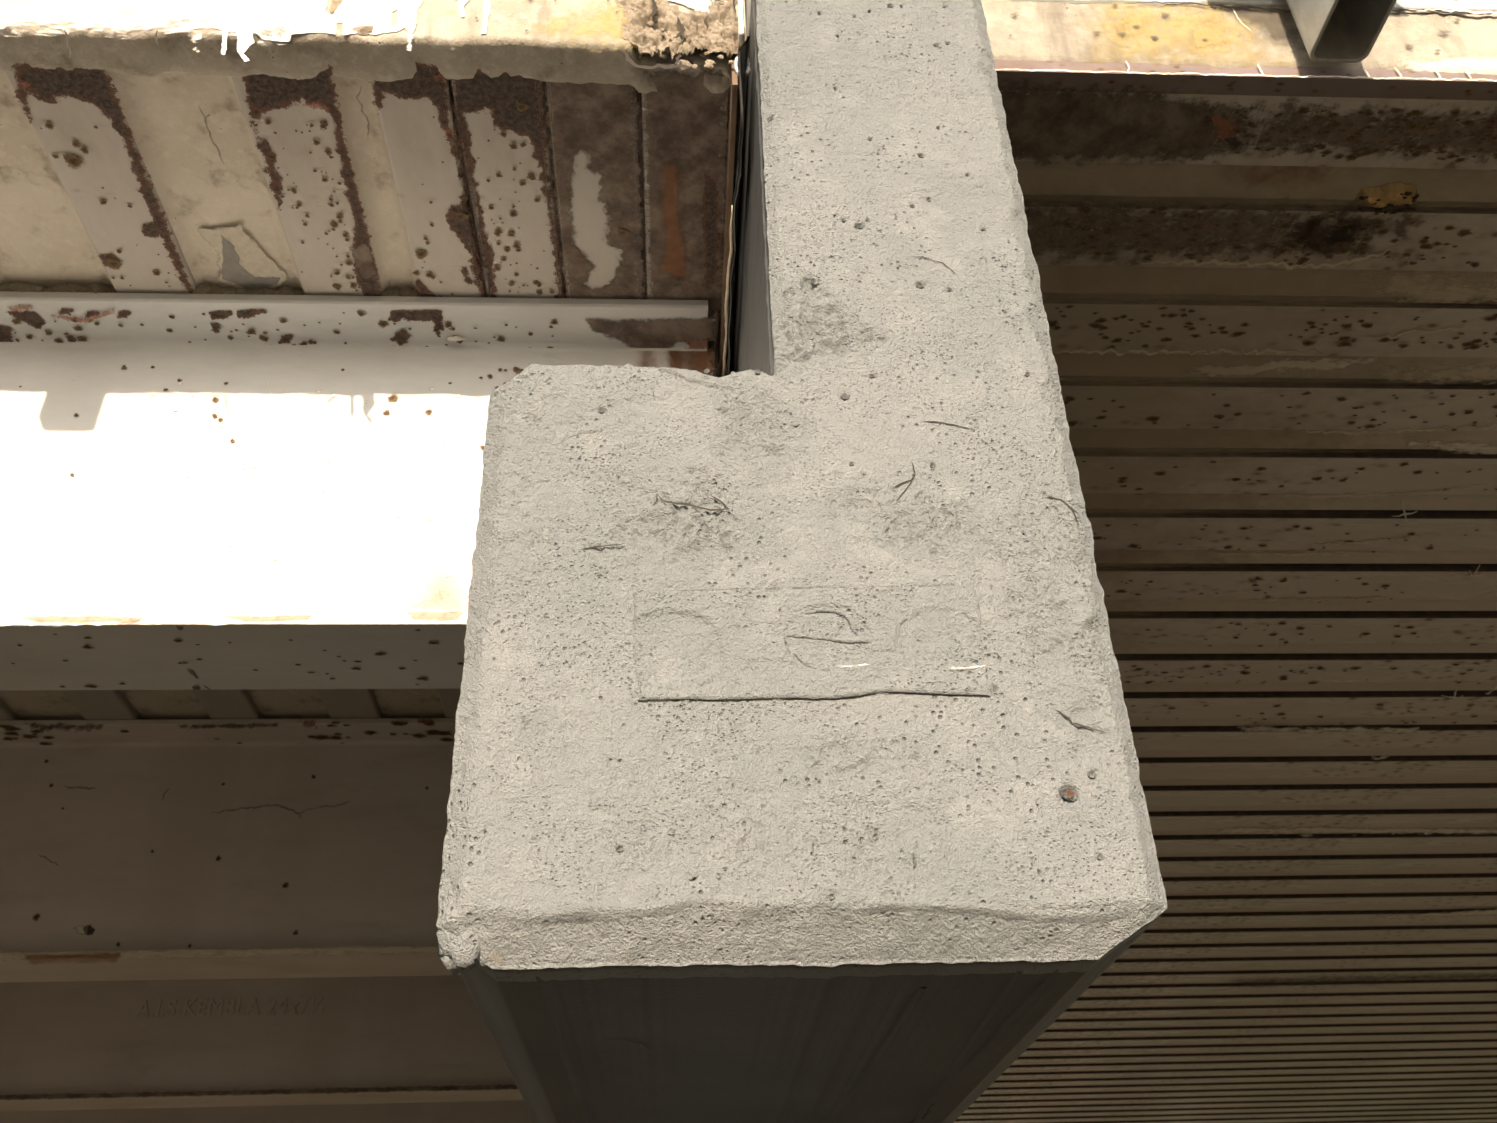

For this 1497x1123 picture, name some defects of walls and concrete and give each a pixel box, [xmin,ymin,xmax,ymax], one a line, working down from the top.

spalling [616,0,745,59]
corrosion [51,140,88,169]
peeling [0,0,646,299]
corrosion [999,80,1497,166]
corrosion [106,244,138,286]
corrosion [254,119,372,295]
corrosion [413,223,454,295]
corrosion [455,129,554,295]
corrosion [1025,198,1472,269]
corrosion [0,308,144,343]
corrosion [188,309,558,348]